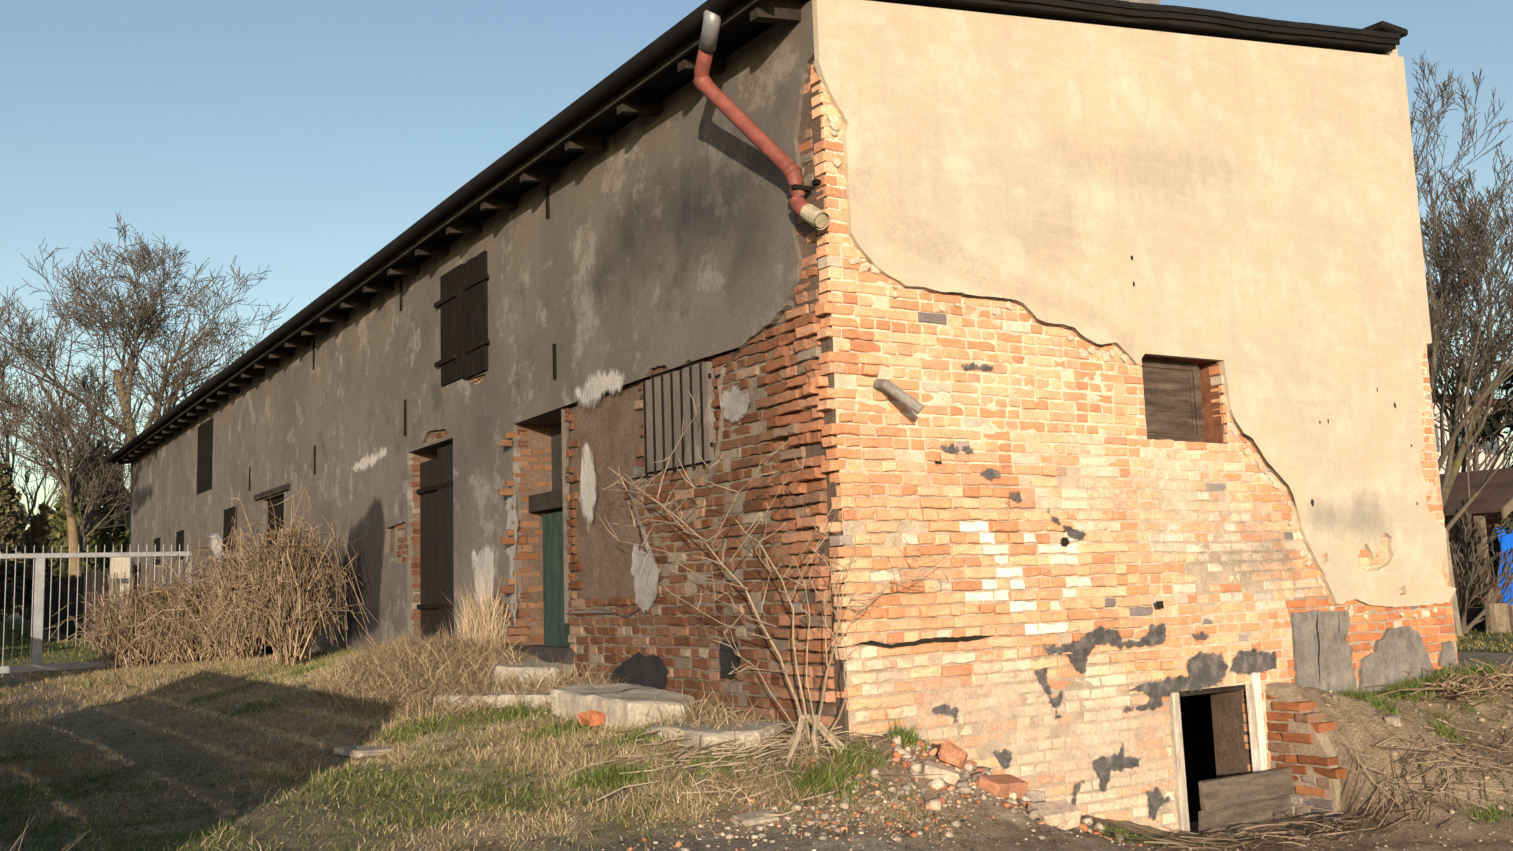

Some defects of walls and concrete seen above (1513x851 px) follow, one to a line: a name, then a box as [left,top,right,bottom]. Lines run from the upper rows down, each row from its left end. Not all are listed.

peeling [469,375,487,384]
peeling [515,64,1369,833]
peeling [1411,344,1445,527]
peeling [395,430,449,639]
peeling [1356,534,1390,572]
peeling [1442,545,1451,587]
peeling [459,592,531,650]